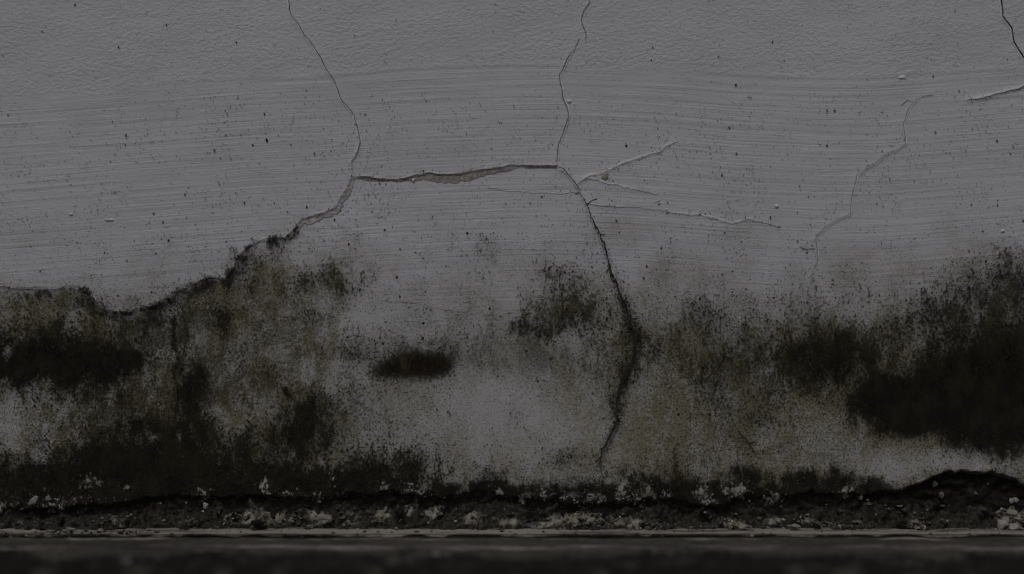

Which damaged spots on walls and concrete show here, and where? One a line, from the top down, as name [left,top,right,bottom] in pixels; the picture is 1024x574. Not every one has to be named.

crack [287,0,360,175]
crack [968,0,1024,101]
water stain [0,57,1024,512]
crack [556,0,677,473]
crack [802,94,930,287]
spalling [0,472,244,515]
spalling [259,476,348,503]
spalling [486,458,1024,520]